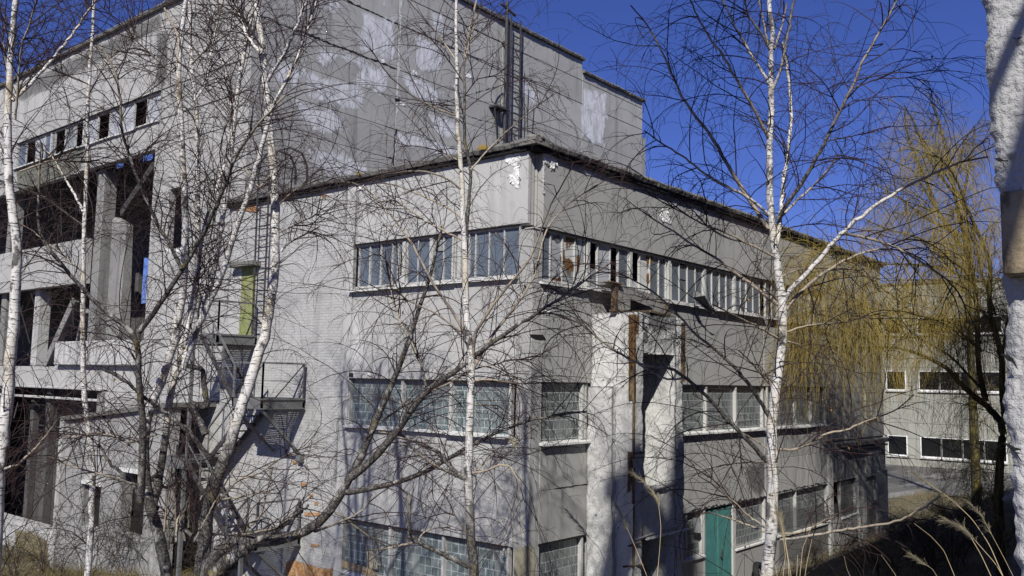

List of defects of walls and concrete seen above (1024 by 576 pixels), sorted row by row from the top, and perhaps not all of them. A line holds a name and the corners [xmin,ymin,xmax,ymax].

spalling [504,152,521,188]
rust [628,314,639,383]